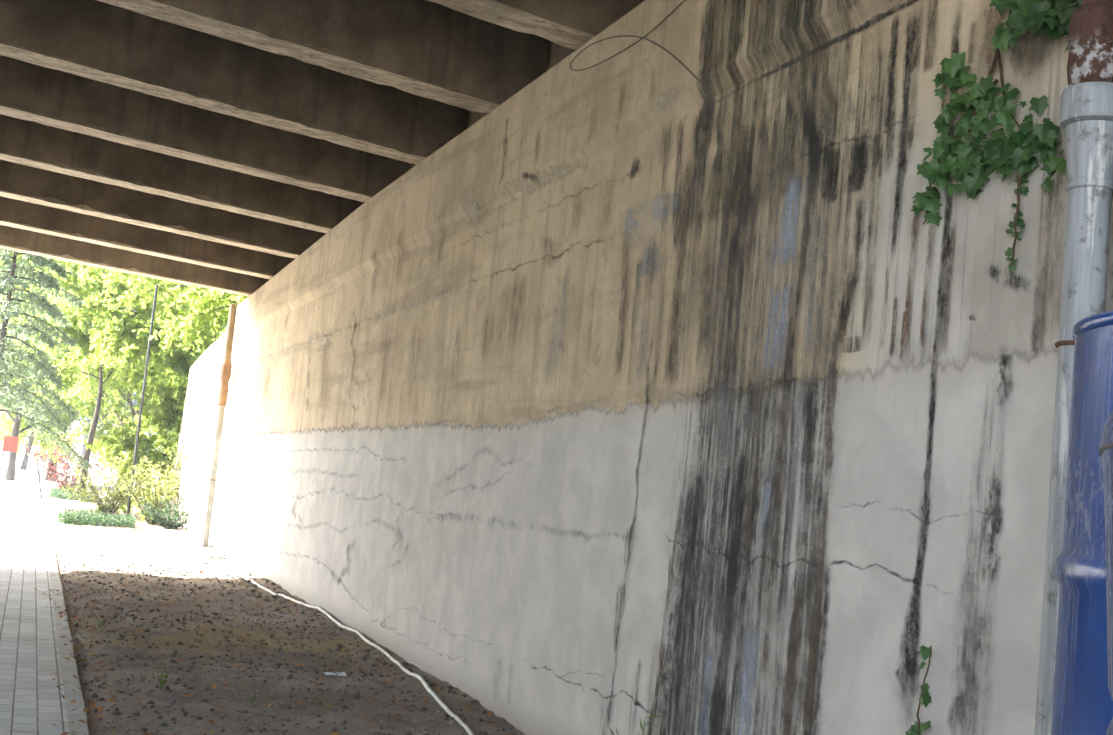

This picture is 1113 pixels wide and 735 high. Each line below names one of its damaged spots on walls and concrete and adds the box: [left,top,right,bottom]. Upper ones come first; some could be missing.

water stain [951,20,959,54]
crack [629,341,652,536]
water stain [616,0,920,735]
water stain [896,173,954,696]
water stain [989,266,1020,288]
water stain [999,354,1010,403]
crack [533,667,644,720]
water stain [950,475,1001,733]